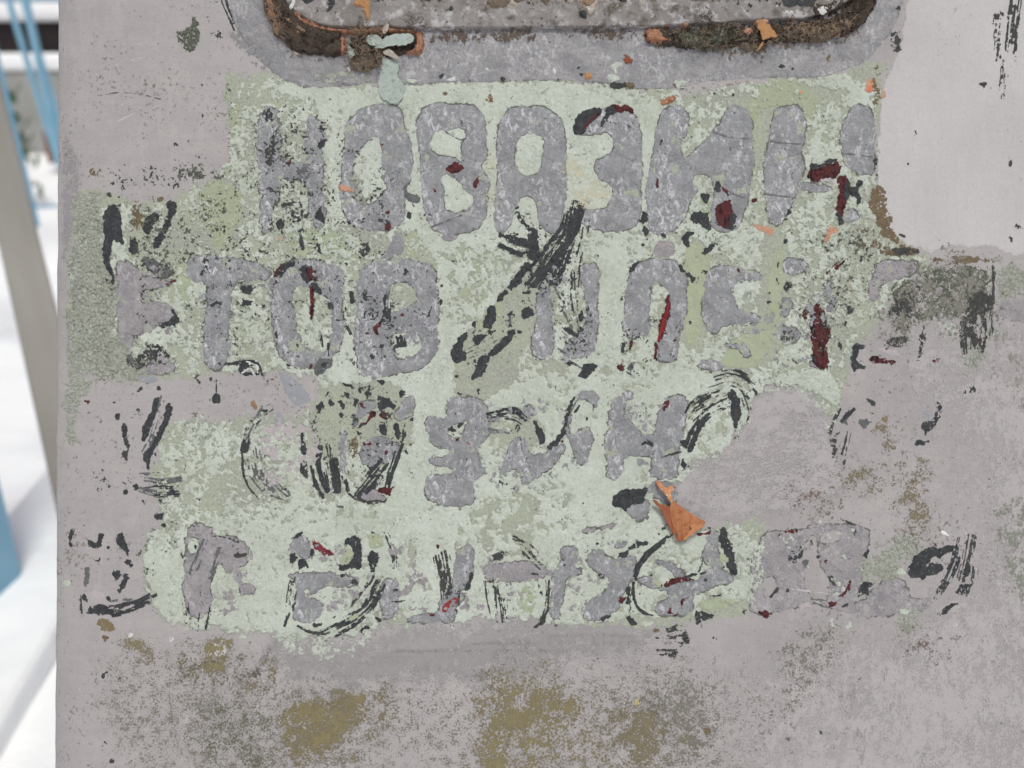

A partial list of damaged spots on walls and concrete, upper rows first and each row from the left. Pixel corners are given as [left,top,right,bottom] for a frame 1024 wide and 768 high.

peeling [979,0,1022,99]
peeling [57,0,980,661]
leakage [91,242,1024,768]
peeling [954,255,1024,373]